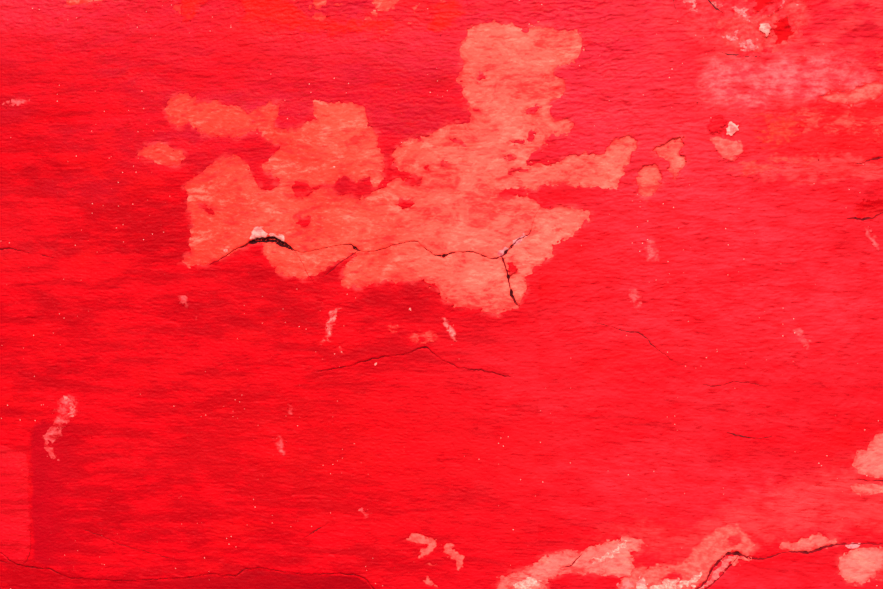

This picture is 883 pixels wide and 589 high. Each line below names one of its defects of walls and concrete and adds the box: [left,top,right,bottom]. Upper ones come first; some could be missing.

peeling [364,0,399,33]
peeling [165,19,637,317]
peeling [636,136,686,197]
crack [209,217,535,308]
peeling [850,433,883,497]
peeling [0,569,372,589]
peeling [406,533,466,588]
peeling [497,523,758,589]
crack [696,543,882,589]
peeling [779,532,883,586]